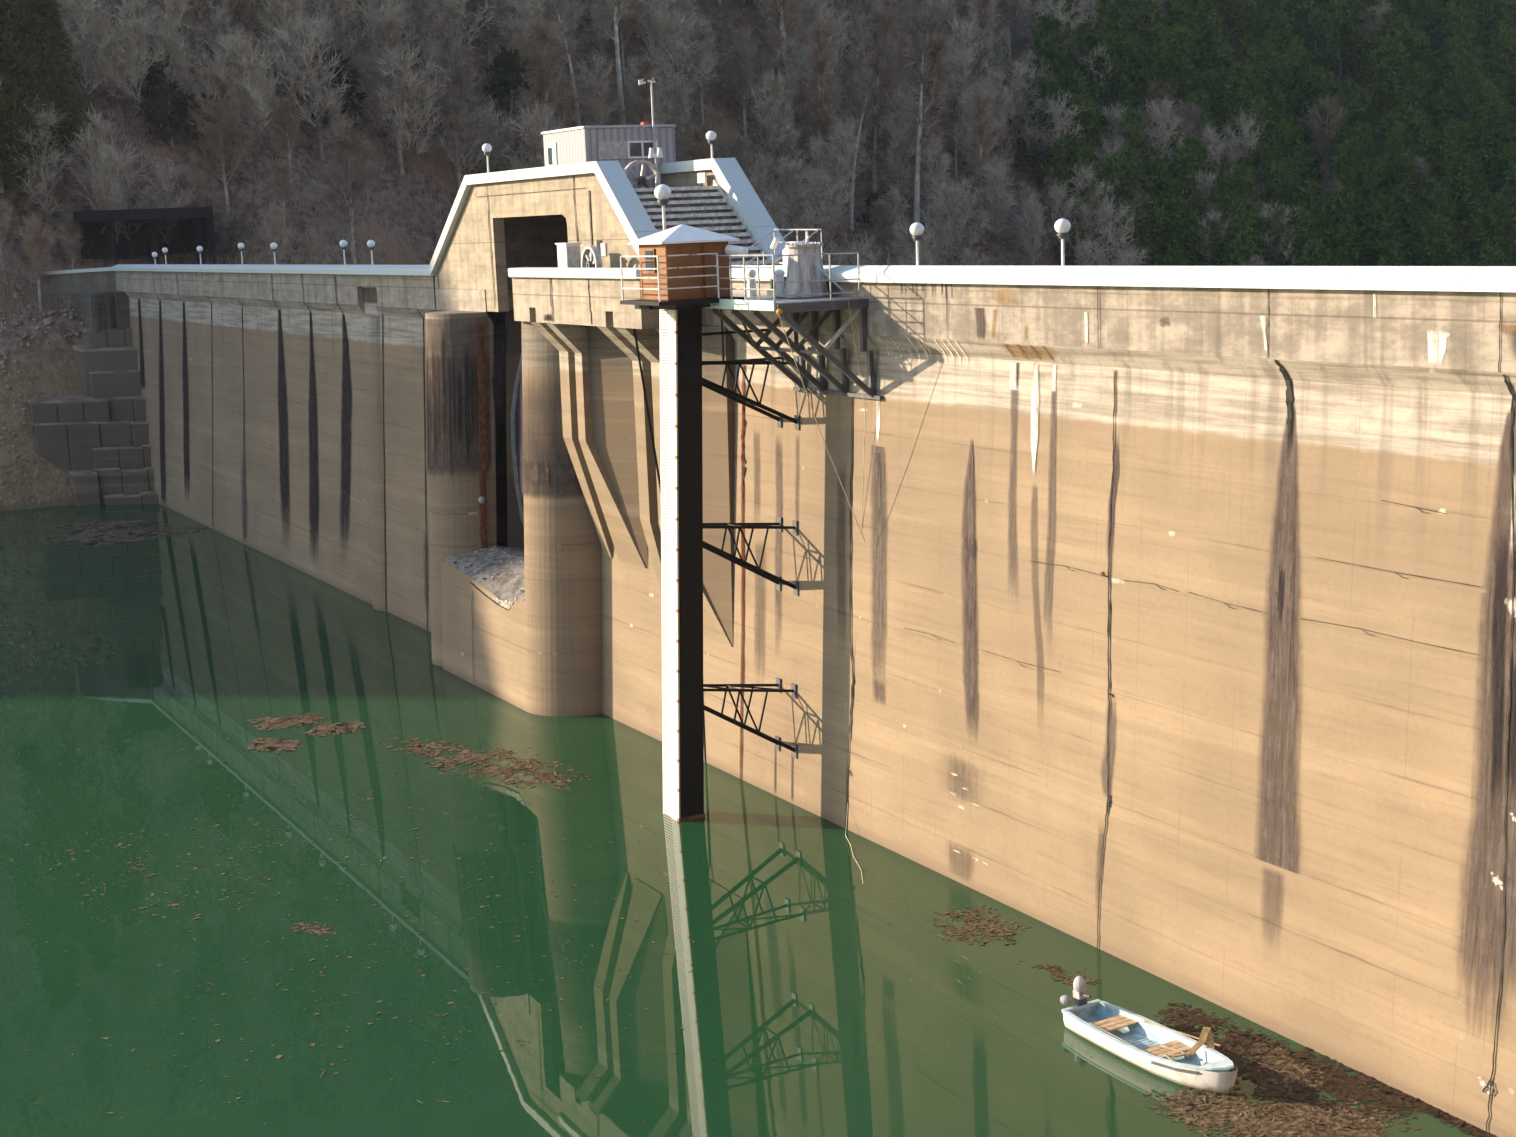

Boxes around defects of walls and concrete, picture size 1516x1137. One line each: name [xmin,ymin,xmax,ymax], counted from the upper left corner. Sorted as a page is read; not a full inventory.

leakage [278,310,289,529]
leakage [309,312,319,551]
leakage [340,315,352,540]
leakage [425,317,506,475]
leakage [862,400,885,701]
leakage [962,439,977,723]
leakage [1008,363,1056,635]
crack [1031,372,1261,948]
leakage [1259,381,1299,917]
crack [1300,292,1515,1132]
leakage [1462,412,1516,1002]